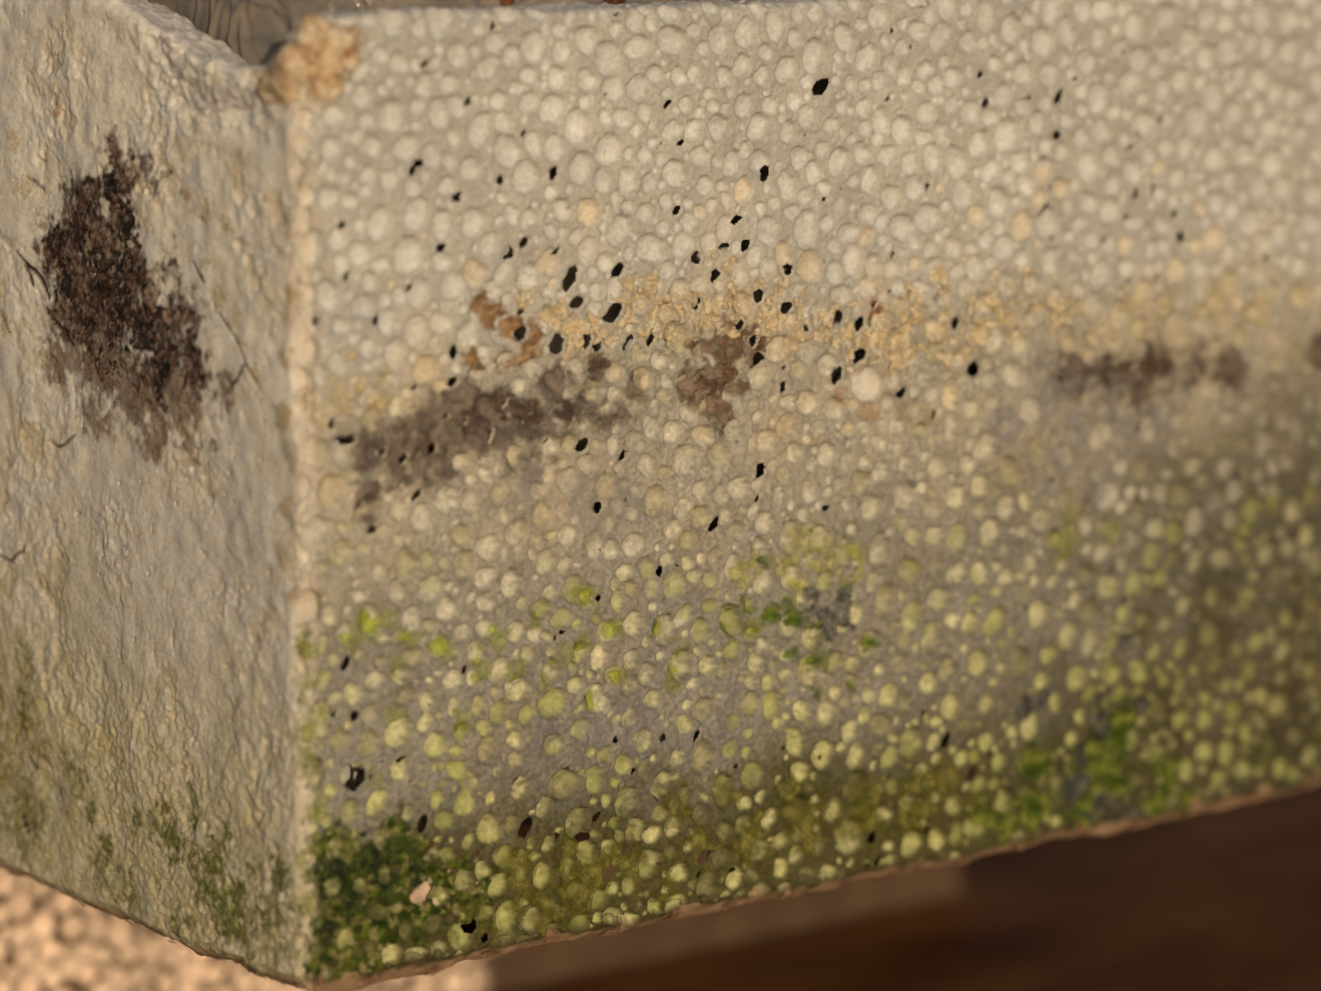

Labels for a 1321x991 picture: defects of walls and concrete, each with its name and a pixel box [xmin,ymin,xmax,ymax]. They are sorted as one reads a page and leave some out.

damp [804,586,856,641]
damp [1186,566,1243,689]
damp [1017,687,1053,721]
damp [1059,690,1137,824]